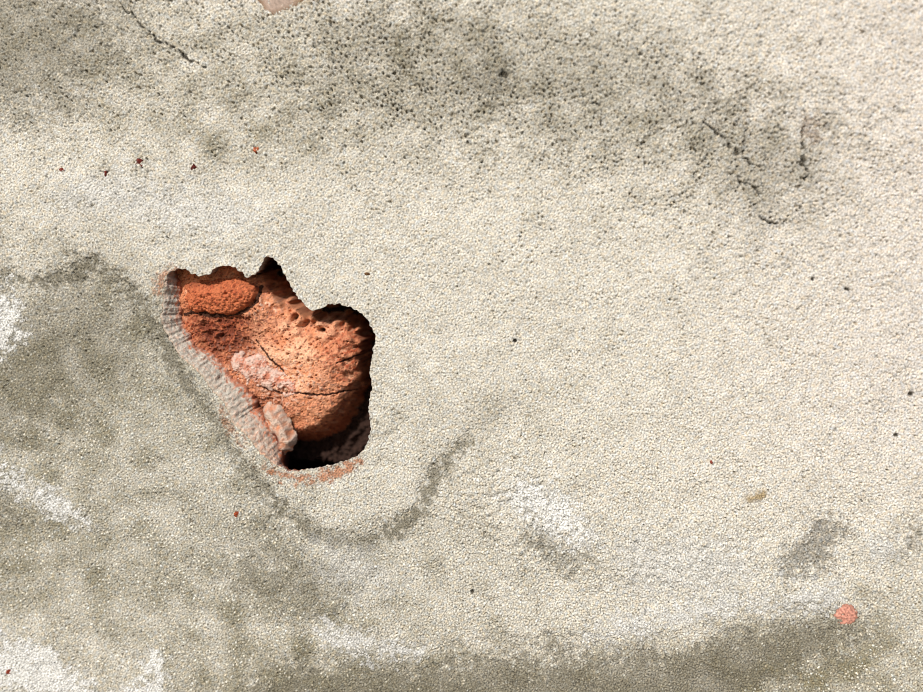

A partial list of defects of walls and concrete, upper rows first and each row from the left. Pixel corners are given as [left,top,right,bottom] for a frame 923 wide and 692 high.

spalling [160,256,376,472]